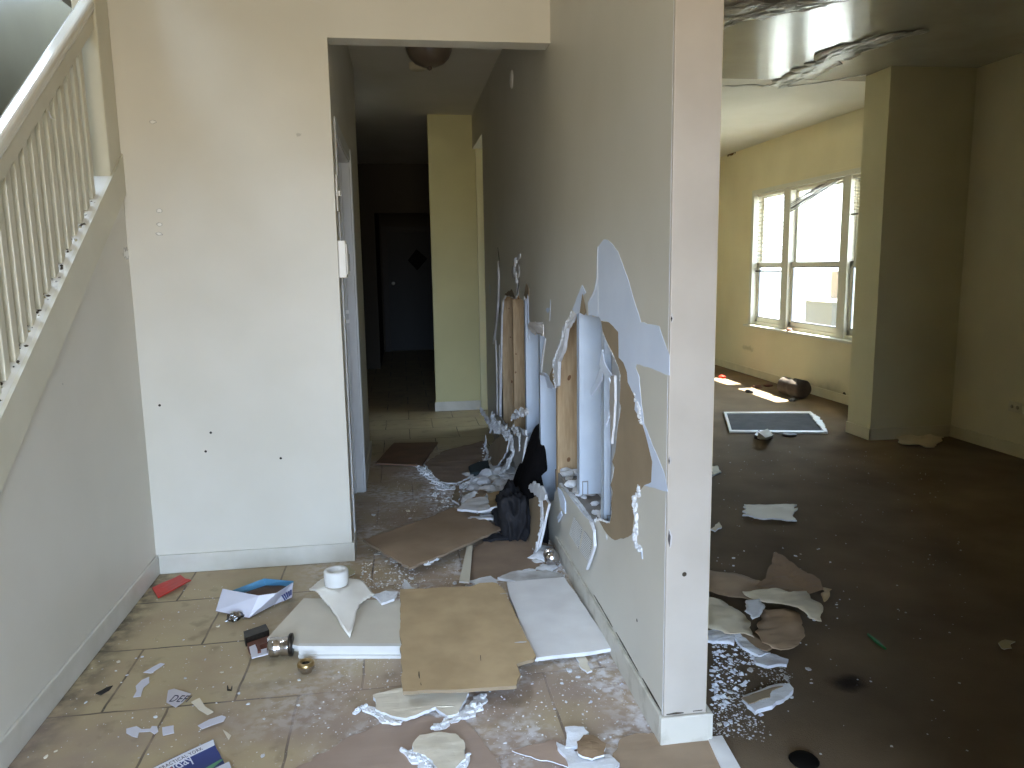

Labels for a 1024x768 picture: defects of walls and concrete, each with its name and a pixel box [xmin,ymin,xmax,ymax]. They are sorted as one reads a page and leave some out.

peeling [723,0,847,30]
peeling [760,29,929,89]
spalling [511,253,521,294]
peeling [540,239,670,559]